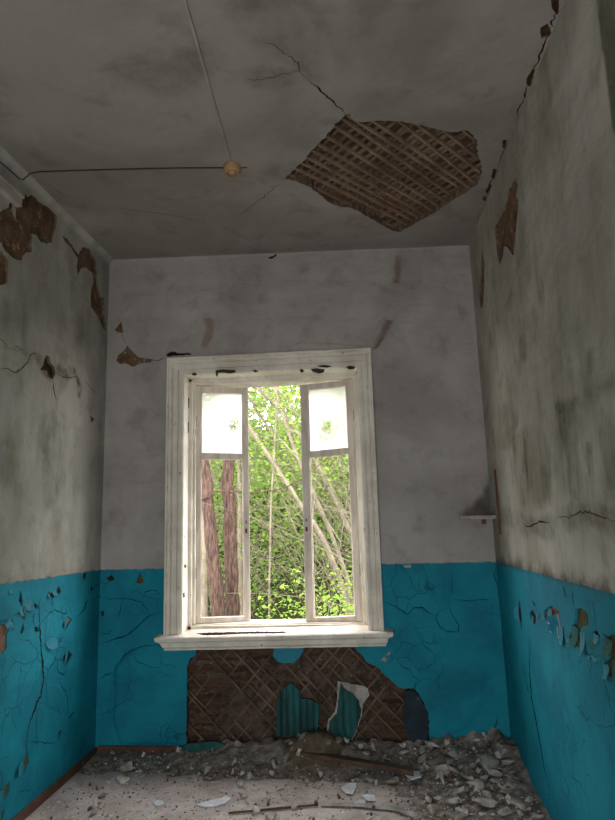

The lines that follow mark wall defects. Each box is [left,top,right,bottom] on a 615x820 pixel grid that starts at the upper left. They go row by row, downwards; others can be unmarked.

crack [250,42,345,114]
crack [517,0,559,118]
spalling [0,194,123,333]
spalling [285,114,482,232]
crack [477,140,507,219]
spalling [495,179,518,263]
spalling [117,346,154,367]
crack [524,510,614,527]
crack [15,596,85,758]
crack [100,590,159,686]
spalling [186,647,412,744]
peeling [514,599,615,685]